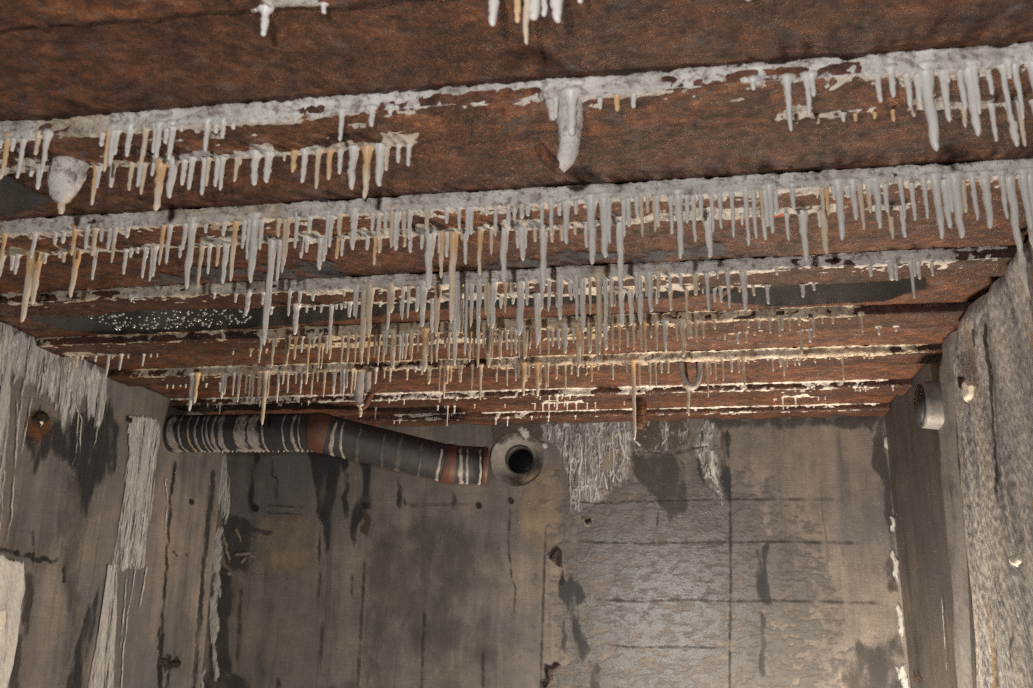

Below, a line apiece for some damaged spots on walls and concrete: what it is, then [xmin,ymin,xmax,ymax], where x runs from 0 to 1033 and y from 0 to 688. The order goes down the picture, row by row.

leakage [0,322,129,514]
leakage [201,415,230,524]
leakage [281,415,385,560]
leakage [393,406,457,426]
leakage [458,448,482,485]
leakage [659,405,768,415]
leakage [773,394,850,413]
leakage [811,416,895,532]
leakage [157,462,177,688]
leakage [209,527,223,680]
leakage [841,640,909,688]
leakage [896,604,904,637]